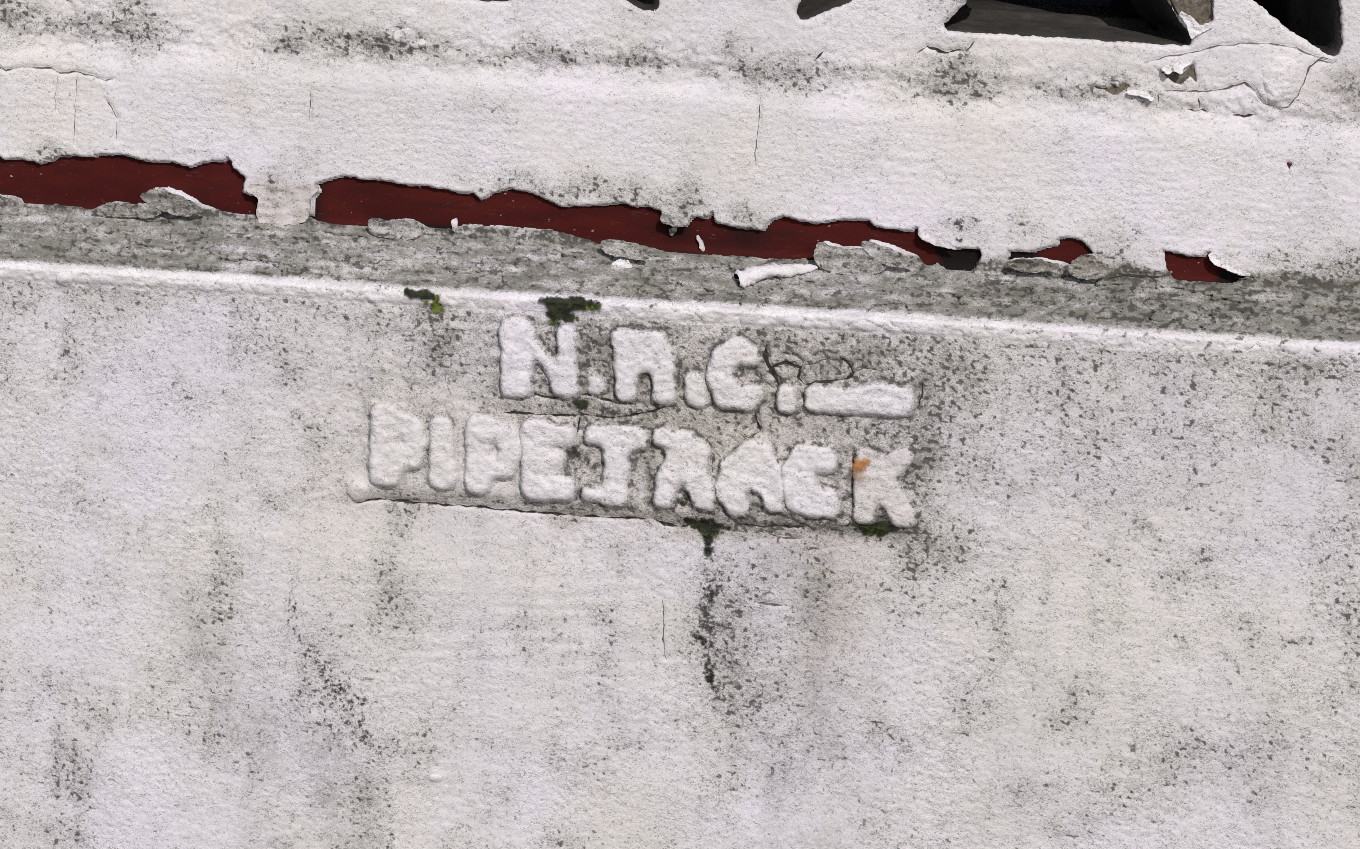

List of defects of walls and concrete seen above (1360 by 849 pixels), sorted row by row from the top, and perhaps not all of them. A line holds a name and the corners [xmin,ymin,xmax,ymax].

peeling [1096,82,1154,101]
peeling [1161,61,1197,85]
peeling [0,155,981,275]
peeling [1007,238,1108,280]
peeling [1165,251,1251,283]
water stain [678,492,736,709]